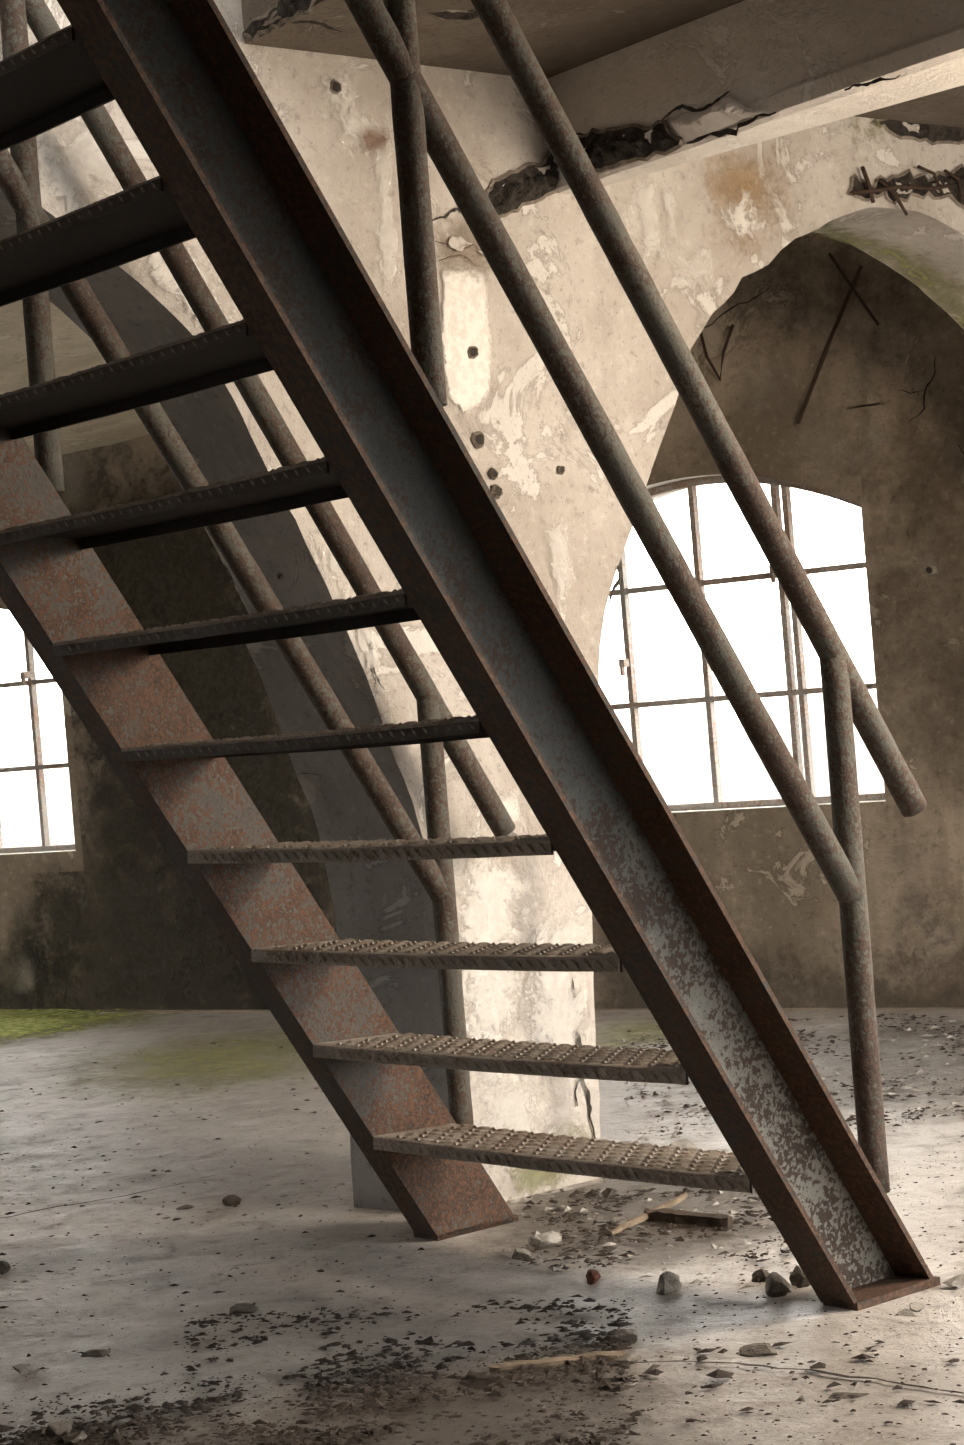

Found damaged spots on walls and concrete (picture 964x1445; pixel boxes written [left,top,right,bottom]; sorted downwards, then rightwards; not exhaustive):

crack [293,21,343,32]
crack [844,75,900,91]
spalling [578,120,683,173]
spalling [870,119,964,146]
spalling [485,150,559,218]
spalling [846,164,964,216]
damp [93,527,249,630]
damp [160,644,281,740]
damp [225,753,320,843]
damp [0,737,269,1010]
damp [292,862,337,934]
crack [572,977,596,1139]